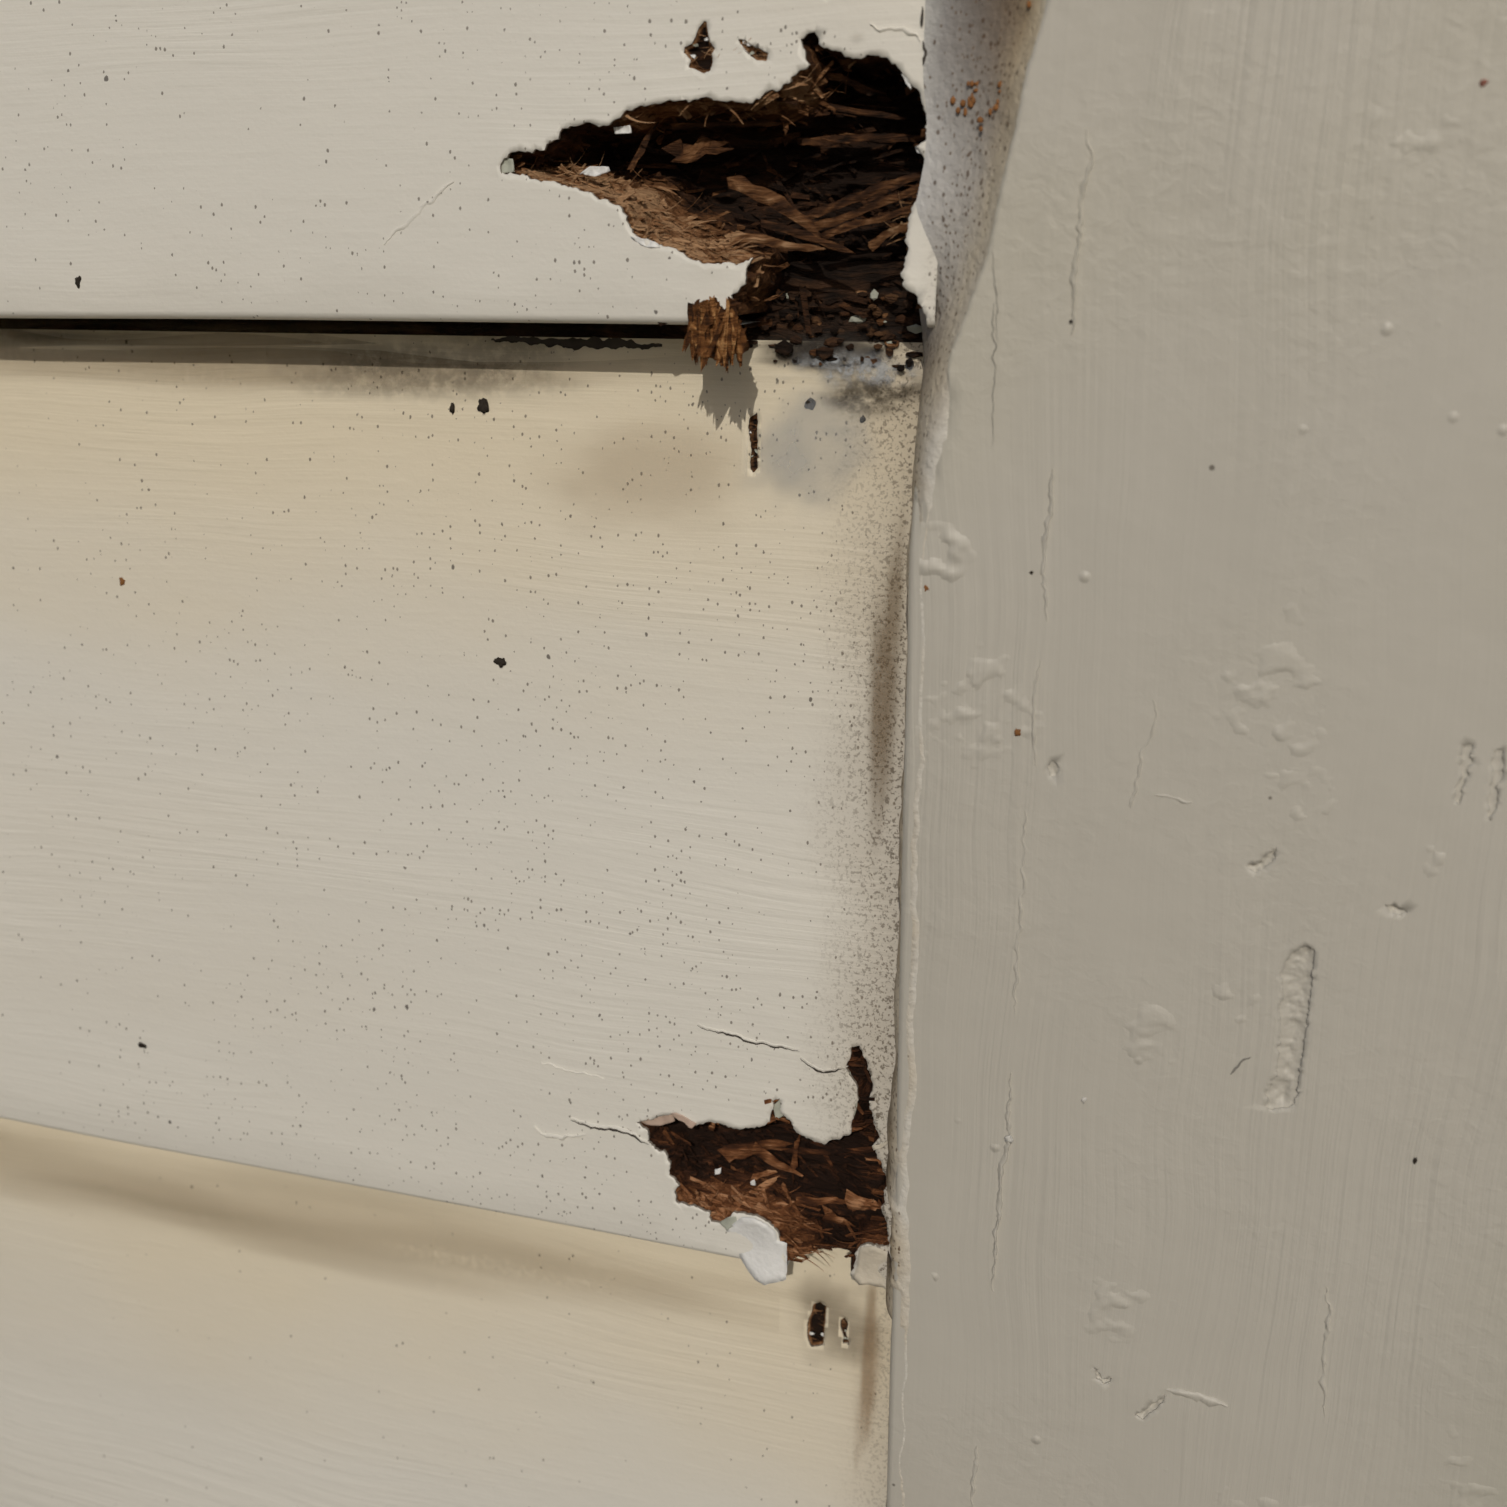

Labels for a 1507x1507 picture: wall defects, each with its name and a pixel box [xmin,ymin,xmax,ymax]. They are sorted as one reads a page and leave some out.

peeling [684,21,768,73]
peeling [613,125,632,134]
peeling [501,158,515,173]
peeling [579,166,610,177]
peeling [631,236,660,248]
peeling [641,1113,697,1129]
peeling [720,1216,787,1285]
peeling [852,1246,888,1289]